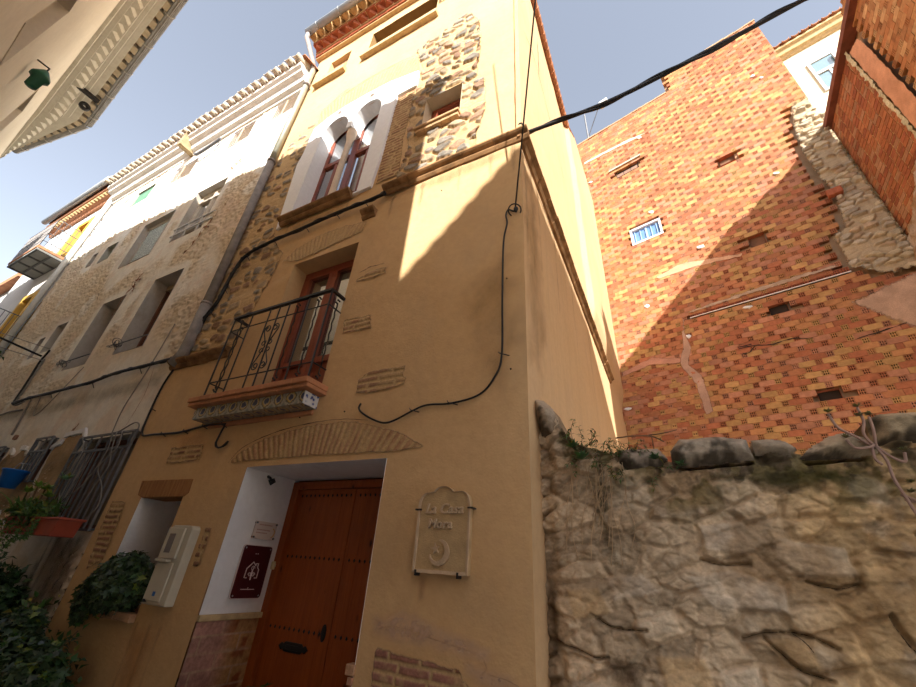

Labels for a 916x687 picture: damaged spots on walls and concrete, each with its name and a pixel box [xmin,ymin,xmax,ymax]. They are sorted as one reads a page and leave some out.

flaking render [371,648,468,687]